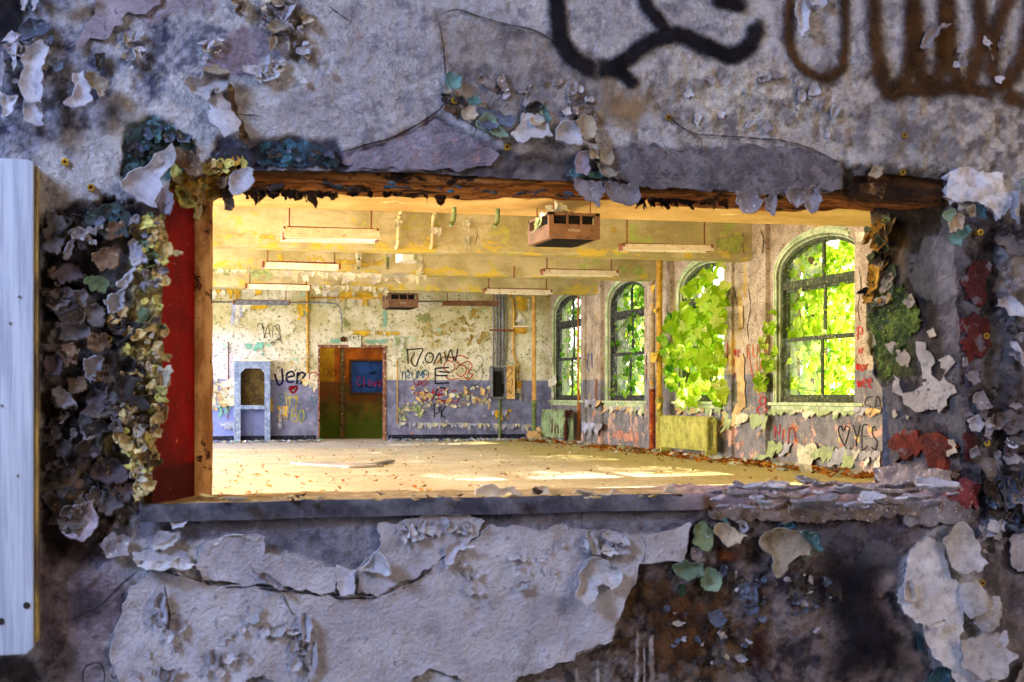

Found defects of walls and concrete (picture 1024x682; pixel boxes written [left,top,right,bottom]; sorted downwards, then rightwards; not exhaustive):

peeling [0,0,161,126]
peeling [230,0,247,17]
peeling [242,0,315,83]
crack [338,9,554,153]
peeling [441,71,823,216]
peeling [39,37,498,542]
peeling [854,214,915,309]
flaking render [941,166,1024,247]
peeling [98,234,1024,682]
crack [162,571,377,682]
crack [403,568,433,589]
leakage [826,560,905,671]